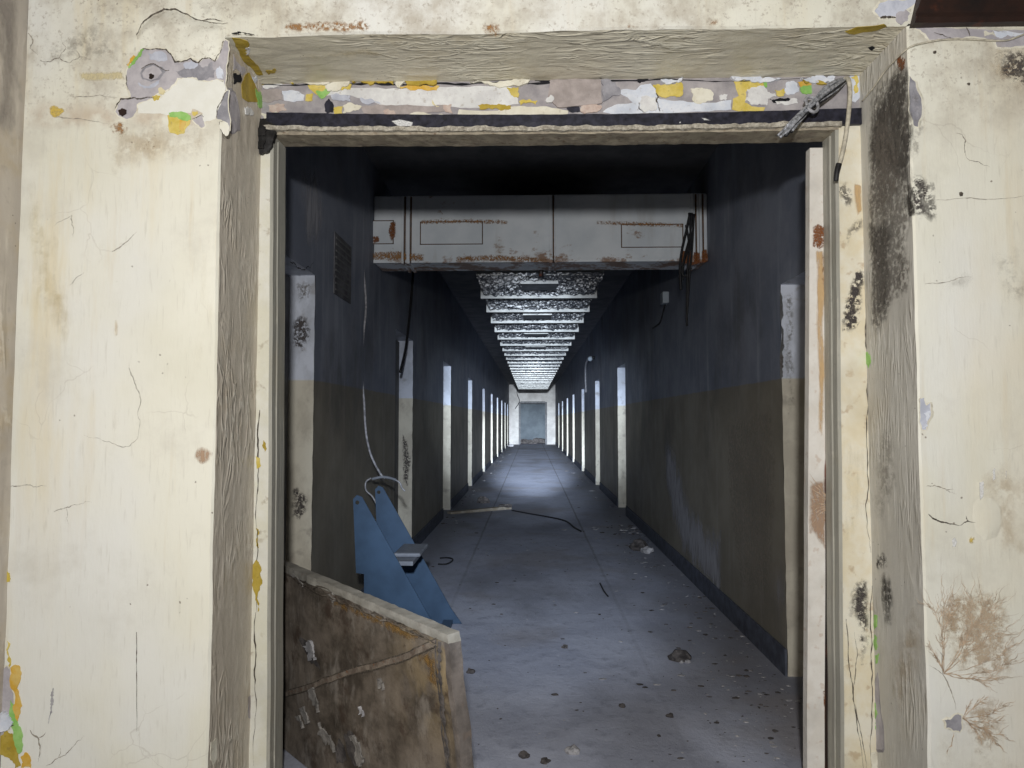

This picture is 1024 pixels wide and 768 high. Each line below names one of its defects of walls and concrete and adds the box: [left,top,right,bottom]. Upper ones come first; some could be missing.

crack [136,8,254,35]
rust [285,22,367,31]
spalling [115,37,835,137]
spalling [908,76,924,128]
water stain [1002,53,1024,82]
water stain [845,72,935,328]
rust [373,222,422,261]
rust [813,224,824,420]
rust [809,444,826,543]
crack [928,514,975,526]
water stain [856,587,867,641]
spalling [0,636,31,768]